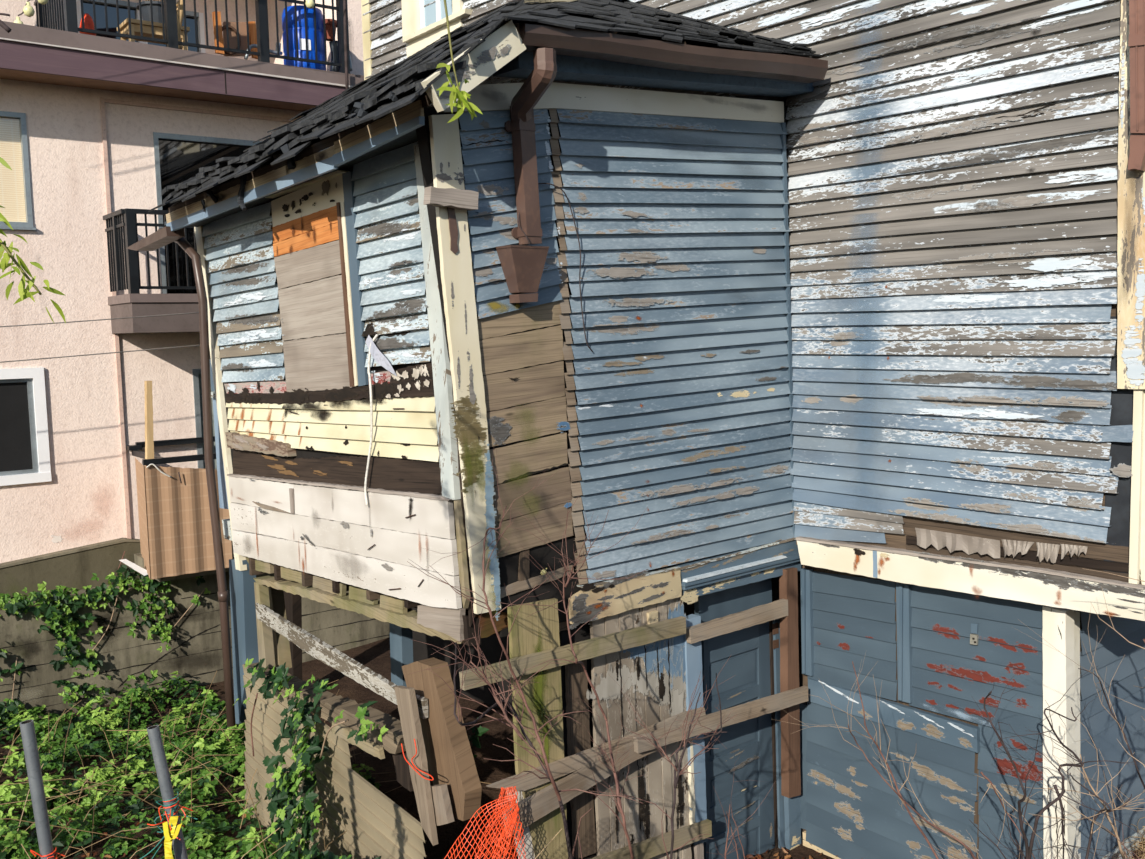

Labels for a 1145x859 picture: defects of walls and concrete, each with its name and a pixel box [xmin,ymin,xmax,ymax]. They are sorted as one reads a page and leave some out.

peeling [755,0,881,29]
peeling [786,0,1121,102]
peeling [881,41,1125,214]
peeling [586,251,690,278]
peeling [930,248,1117,304]
peeling [359,259,430,398]
peeling [573,296,673,335]
peeling [882,258,1145,428]
peeling [889,492,1106,543]
peeling [569,569,669,629]
peeling [586,634,687,717]
peeling [889,739,1043,815]